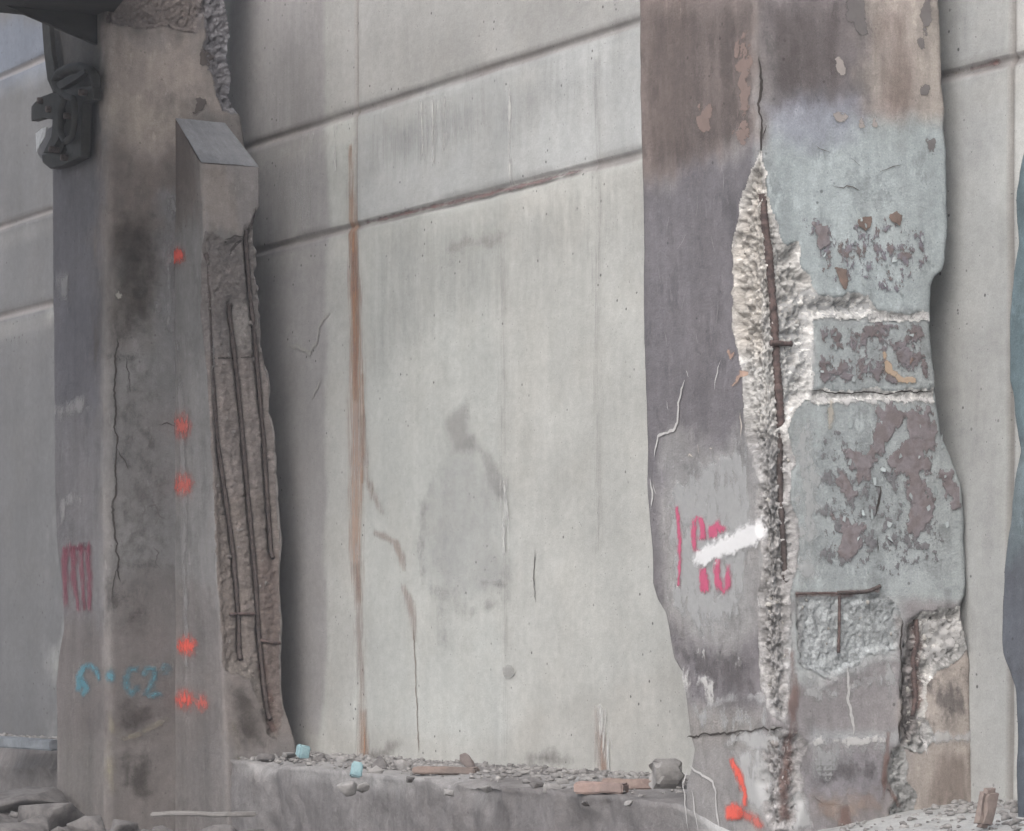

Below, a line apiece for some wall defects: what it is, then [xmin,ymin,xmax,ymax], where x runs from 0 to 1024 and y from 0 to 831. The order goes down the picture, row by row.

spalling [106,0,237,115]
crack [111,340,171,598]
spalling [200,209,283,740]
rust [349,170,579,591]
spalling [731,151,967,831]
crack [688,726,781,745]